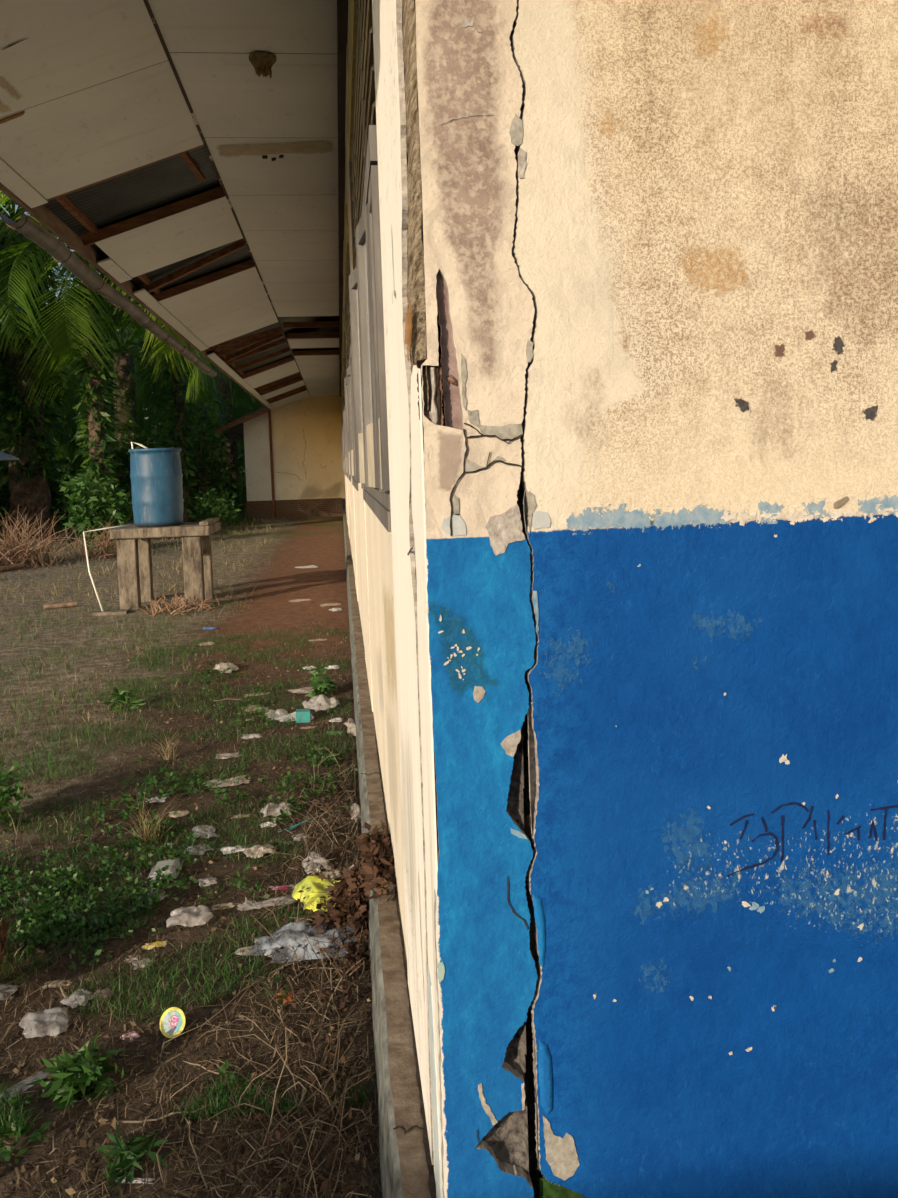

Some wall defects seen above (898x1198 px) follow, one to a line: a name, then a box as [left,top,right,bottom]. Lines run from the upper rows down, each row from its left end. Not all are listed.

water stain [427,0,498,327]
spalling [402,0,523,439]
water stain [734,398,749,412]
water stain [830,336,845,373]
water stain [862,405,878,421]
crack [449,421,528,536]
peeling [485,491,551,556]
peeling [566,493,898,537]
crack [506,675,539,974]
peeling [646,804,898,938]
crack [476,1010,552,1183]
spalling [543,1115,580,1181]